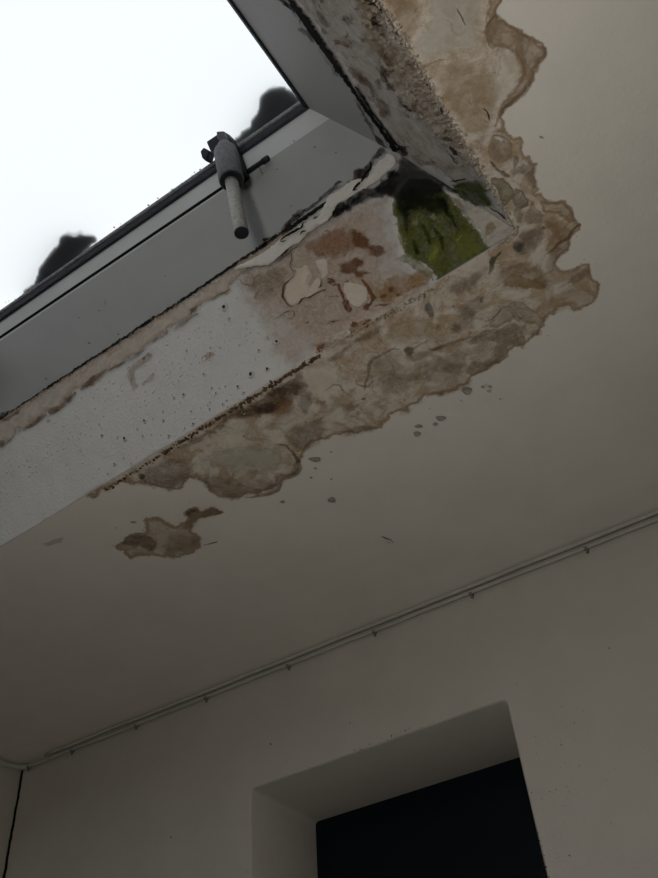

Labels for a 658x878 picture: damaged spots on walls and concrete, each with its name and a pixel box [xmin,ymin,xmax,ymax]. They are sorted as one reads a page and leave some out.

peeling [350,0,519,247]
peeling [95,153,436,497]
water stain [0,0,600,503]
water stain [116,507,223,559]
crack [2,770,23,878]